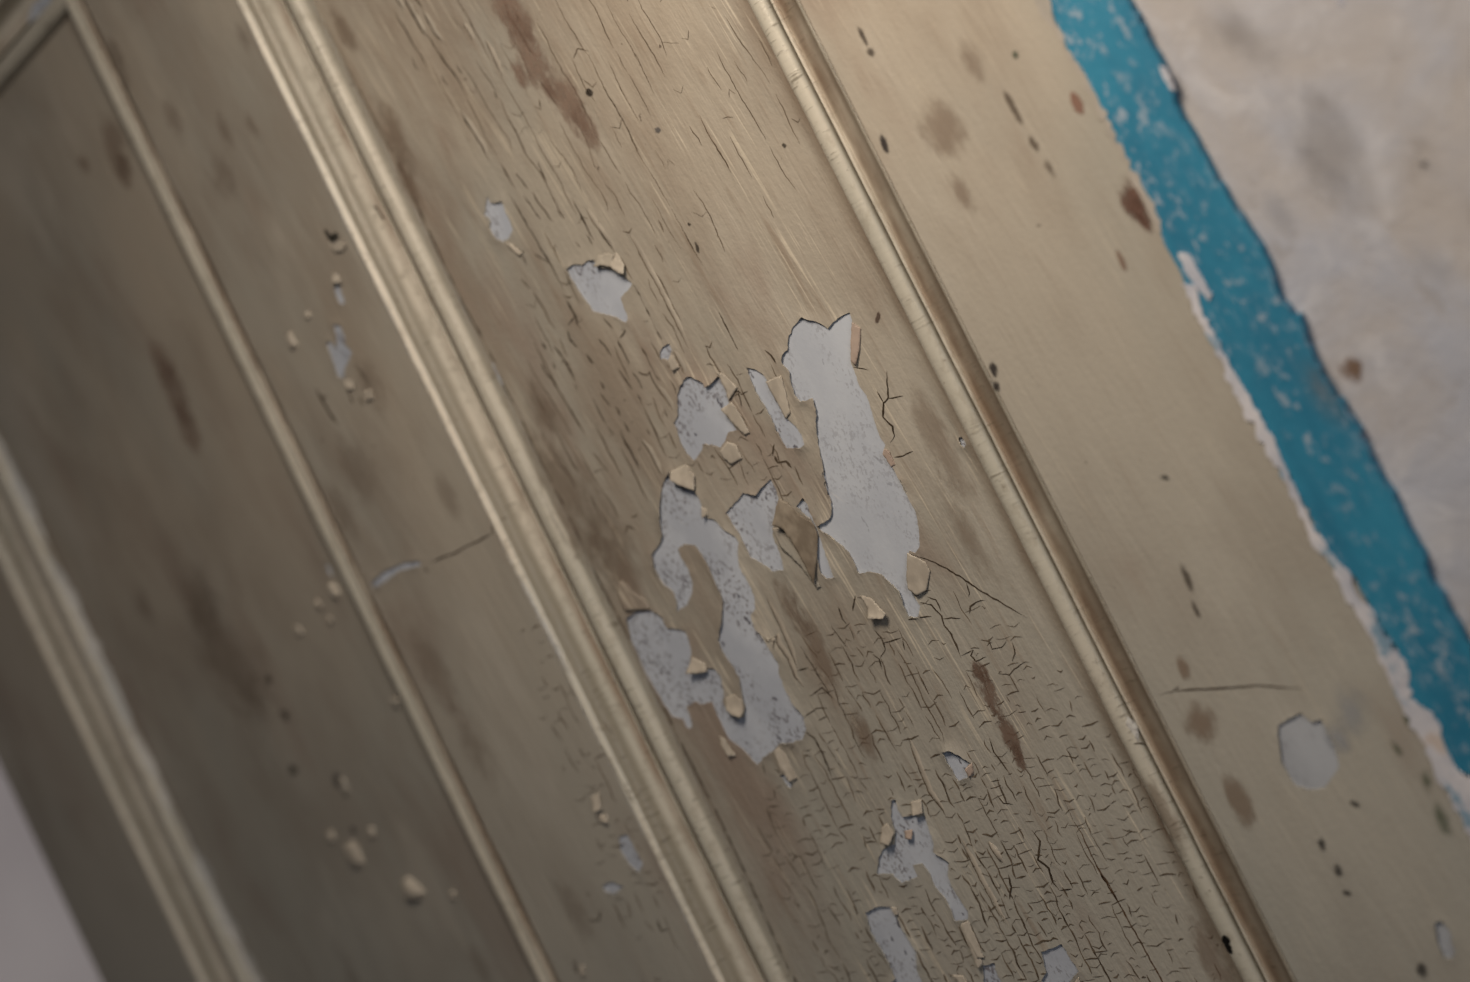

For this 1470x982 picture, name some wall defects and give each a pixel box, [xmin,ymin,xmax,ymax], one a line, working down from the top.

peeling [1034,0,1162,233]
peeling [1160,65,1176,91]
peeling [567,252,632,322]
peeling [617,313,930,788]
peeling [1178,252,1470,835]
peeling [866,906,922,982]
peeling [877,799,1001,982]
peeling [1042,944,1081,982]